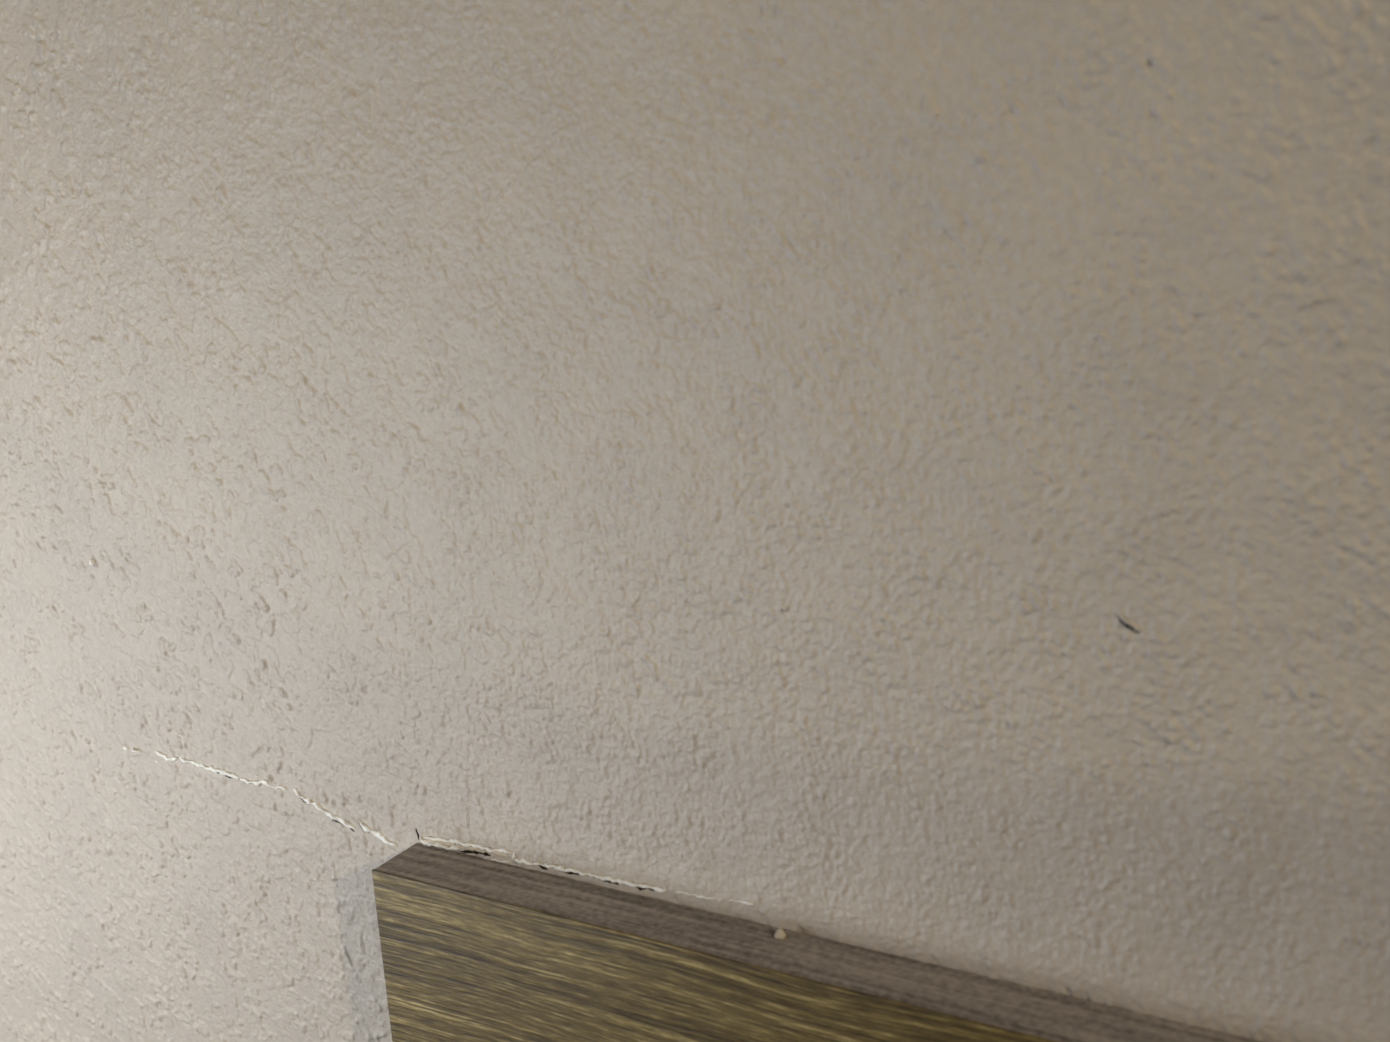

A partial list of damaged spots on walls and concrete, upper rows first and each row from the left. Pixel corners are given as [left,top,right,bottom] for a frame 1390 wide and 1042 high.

crack [123,745,398,846]